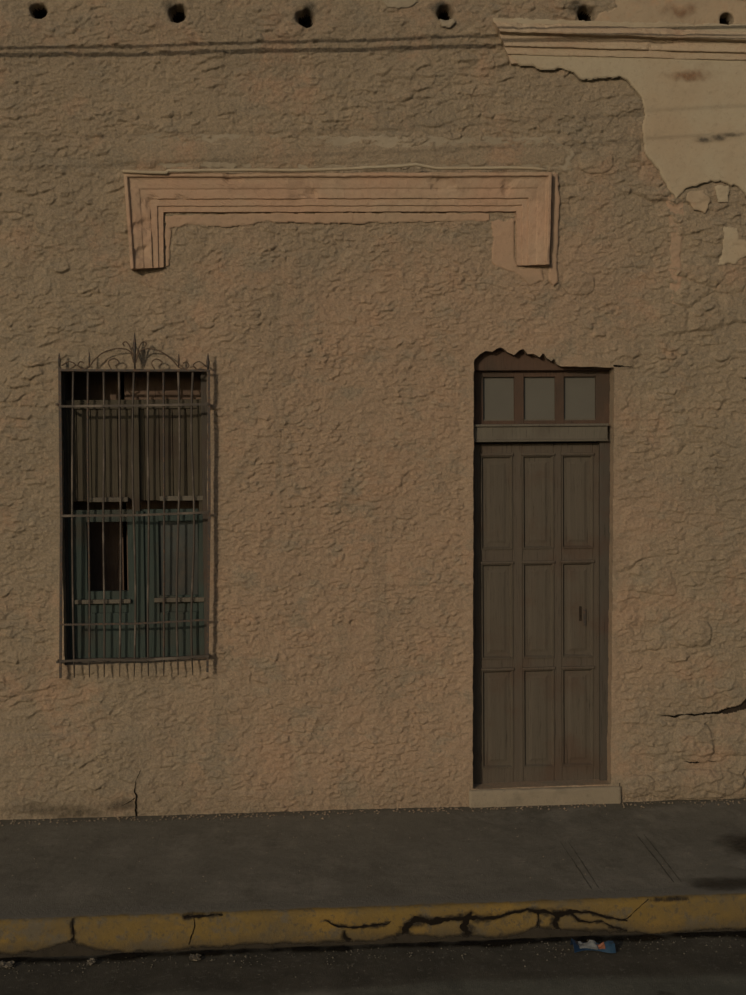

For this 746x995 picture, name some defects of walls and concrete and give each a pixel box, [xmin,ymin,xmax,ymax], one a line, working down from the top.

flaking render [493,0,746,32]
flaking render [510,55,746,304]
spalling [466,336,568,367]
crack [662,708,729,718]
crack [124,770,141,816]
crack [68,918,76,943]
crack [182,913,223,945]
crack [324,896,687,941]